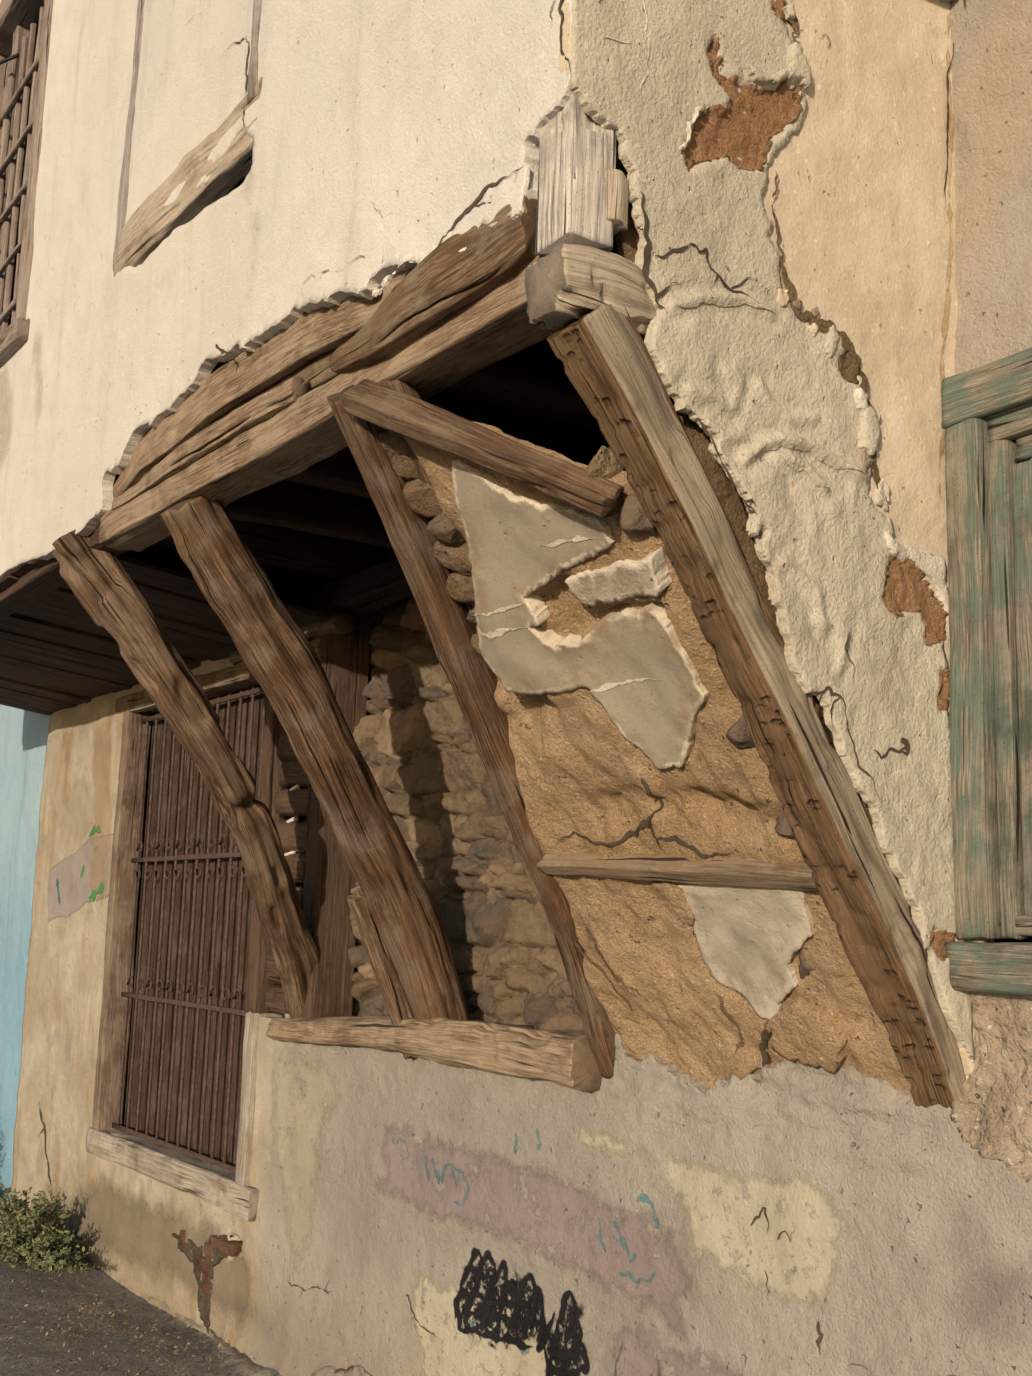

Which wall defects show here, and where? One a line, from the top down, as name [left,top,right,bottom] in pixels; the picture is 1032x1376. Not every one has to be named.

crack [549,0,571,81]
crack [944,0,966,204]
crack [641,192,764,310]
flaking render [679,0,891,512]
flaking render [452,458,709,769]
flaking render [882,531,949,646]
crack [556,778,734,859]
flaking render [574,881,847,1088]
flaking render [950,995,1032,1178]